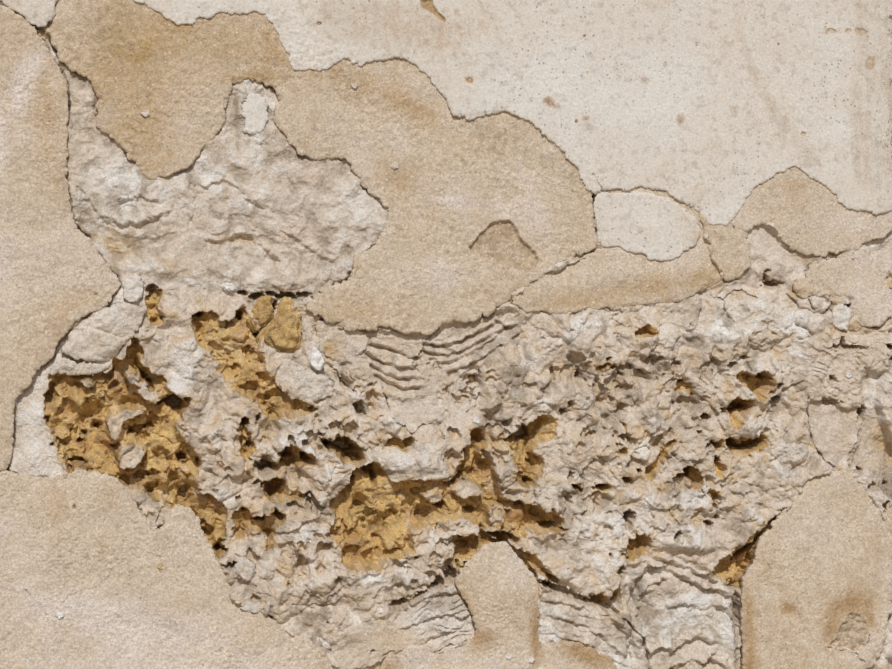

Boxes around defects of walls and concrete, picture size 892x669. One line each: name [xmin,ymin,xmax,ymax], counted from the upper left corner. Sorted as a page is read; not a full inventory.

peeling [49,0,701,335]
spalling [8,166,892,669]
crack [806,397,865,471]
crack [604,571,651,669]